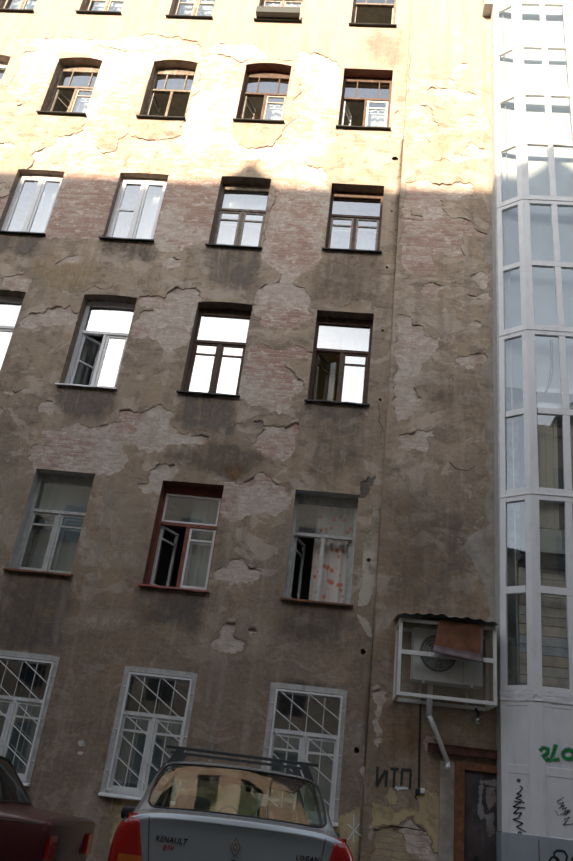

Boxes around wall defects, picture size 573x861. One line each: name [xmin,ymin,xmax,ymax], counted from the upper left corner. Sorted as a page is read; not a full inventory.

flaking render [390,61,477,146]
flaking render [6,33,343,329]
flaking render [391,178,487,296]
flaking render [1,271,32,292]
flaking render [129,284,203,355]
flaking render [238,343,312,462]
flaking render [28,404,211,495]
flaking render [217,471,292,522]
flaking render [214,558,262,585]
peeling [109,797,140,845]
peeling [179,783,258,816]
peeling [334,785,440,861]